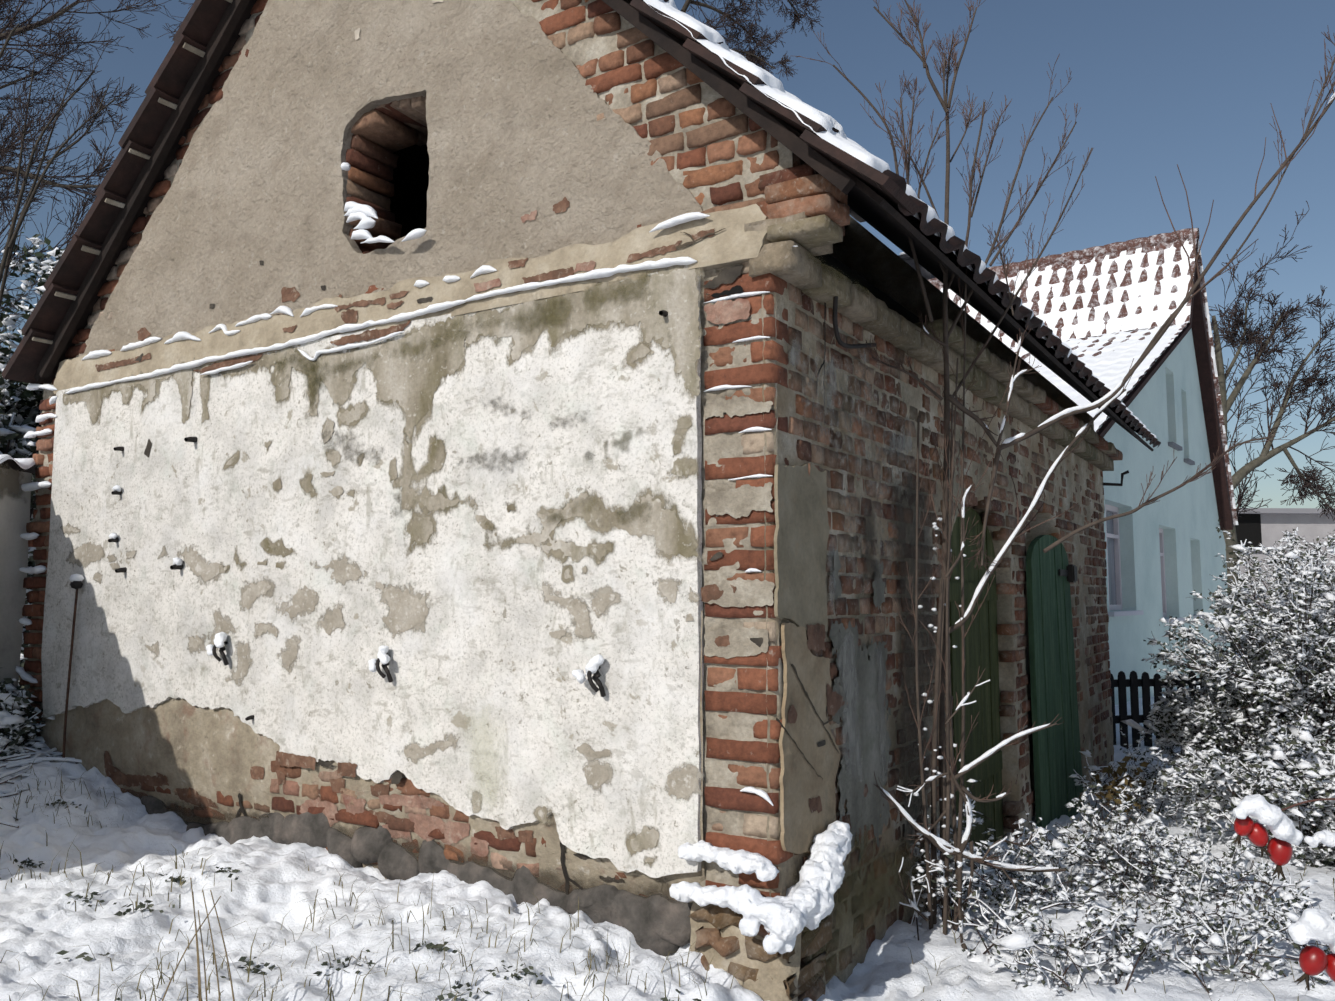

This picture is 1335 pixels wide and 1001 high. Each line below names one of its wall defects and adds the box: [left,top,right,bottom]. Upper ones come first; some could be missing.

peeling [60,228,775,642]
peeling [145,642,160,657]
peeling [158,538,345,686]
flaking render [704,626,769,659]
flaking render [788,705,797,724]
flaking render [807,550,895,862]
flaking render [104,751,218,813]
flaking render [250,733,552,857]
peeling [577,743,613,792]
peeling [665,764,703,801]
flaking render [564,826,662,895]